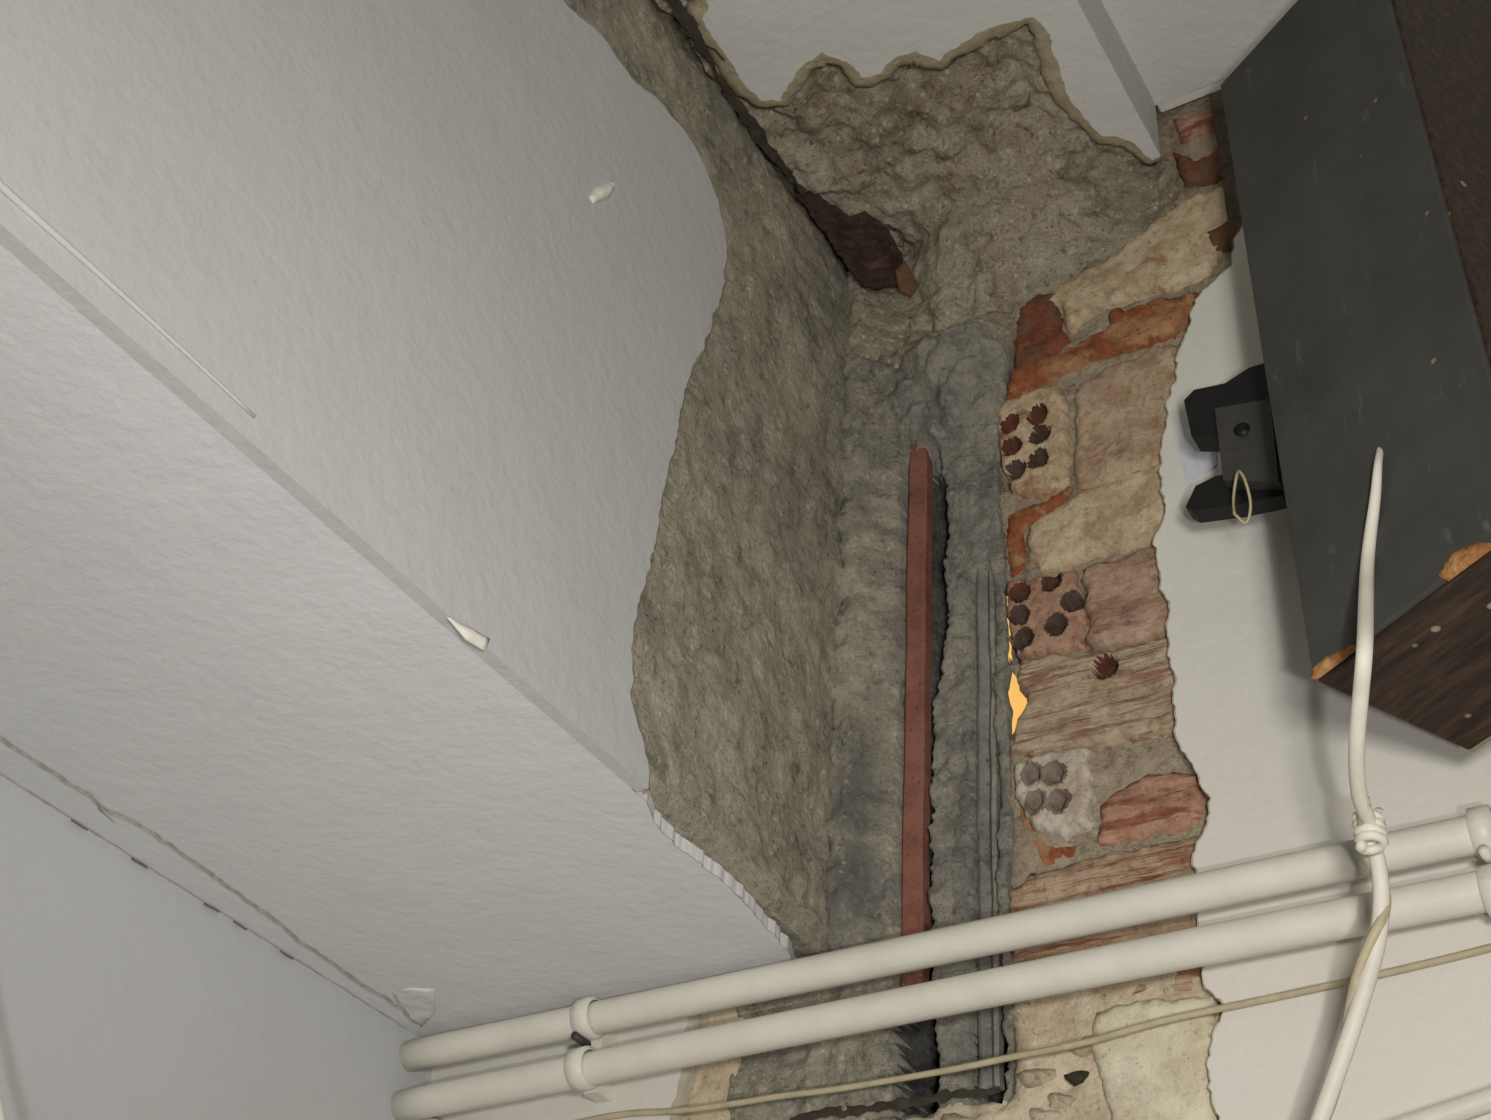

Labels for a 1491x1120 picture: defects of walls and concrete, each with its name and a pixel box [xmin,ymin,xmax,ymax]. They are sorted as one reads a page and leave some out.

corrosion [791,170,918,296]
spalling [564,0,1242,966]
peeling [447,617,490,651]
crack [0,736,420,1029]
flaking render [670,966,1224,1120]
spalling [929,958,978,981]